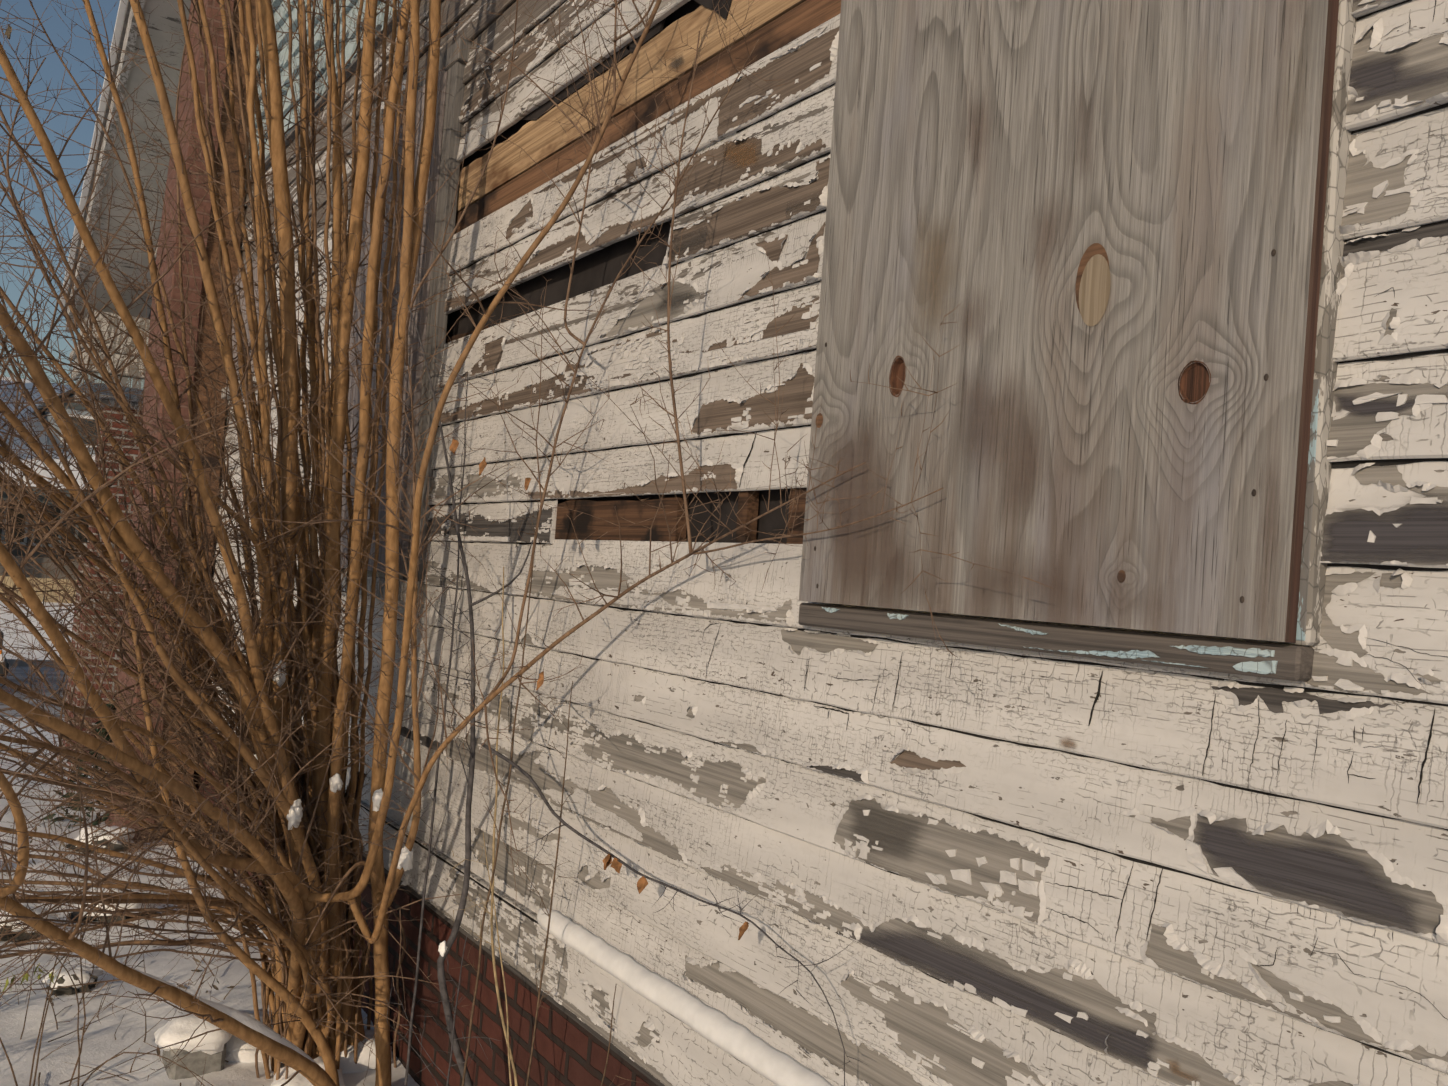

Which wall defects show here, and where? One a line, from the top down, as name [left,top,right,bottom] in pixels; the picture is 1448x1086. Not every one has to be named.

peeling [459,0,613,120]
peeling [1336,0,1448,296]
peeling [440,26,840,436]
peeling [425,459,744,543]
peeling [998,374,1448,719]
crack [804,656,902,730]
crack [1088,671,1103,726]
crack [1202,694,1216,776]
crack [1248,701,1382,783]
crack [1365,638,1446,803]
peeling [393,680,1252,1086]
peeling [1119,807,1448,942]